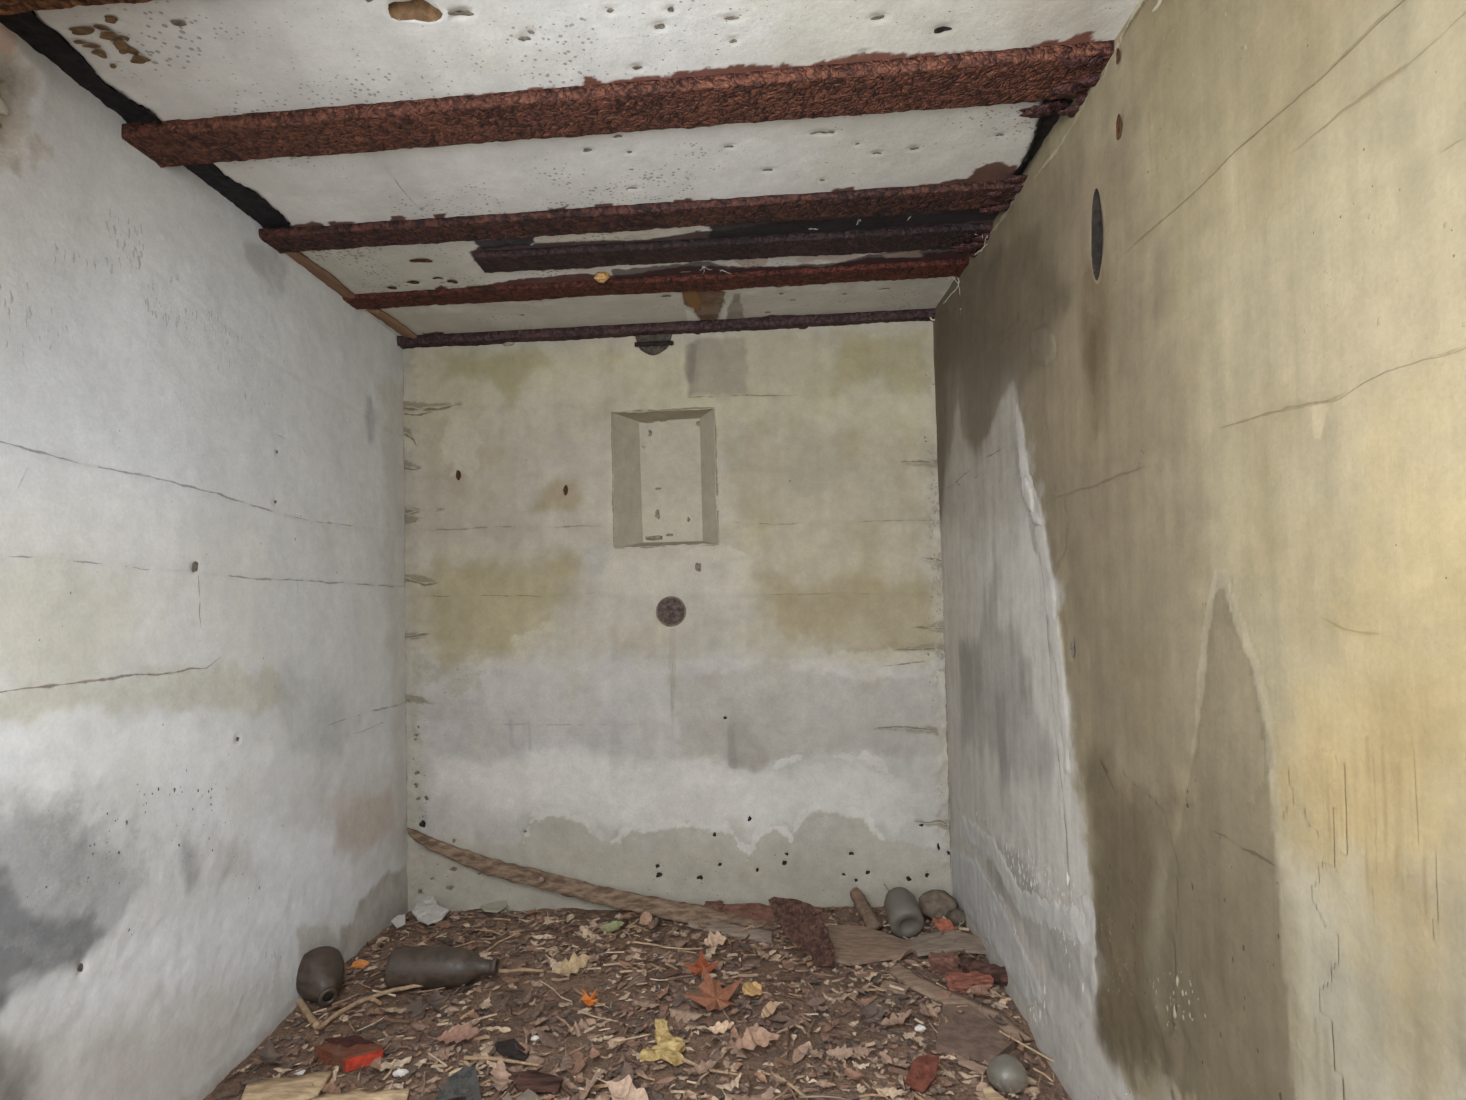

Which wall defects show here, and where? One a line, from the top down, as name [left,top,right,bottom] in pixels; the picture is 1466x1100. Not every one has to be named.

spalling [0,23,63,204]
rust [290,219,357,228]
rust [465,228,708,263]
rust [317,44,1006,108]
rust [905,159,1024,187]
rust [1025,26,1108,47]
leakage [0,630,367,787]
crack [0,379,618,845]
leakage [168,195,1438,1100]
leakage [0,917,129,1100]